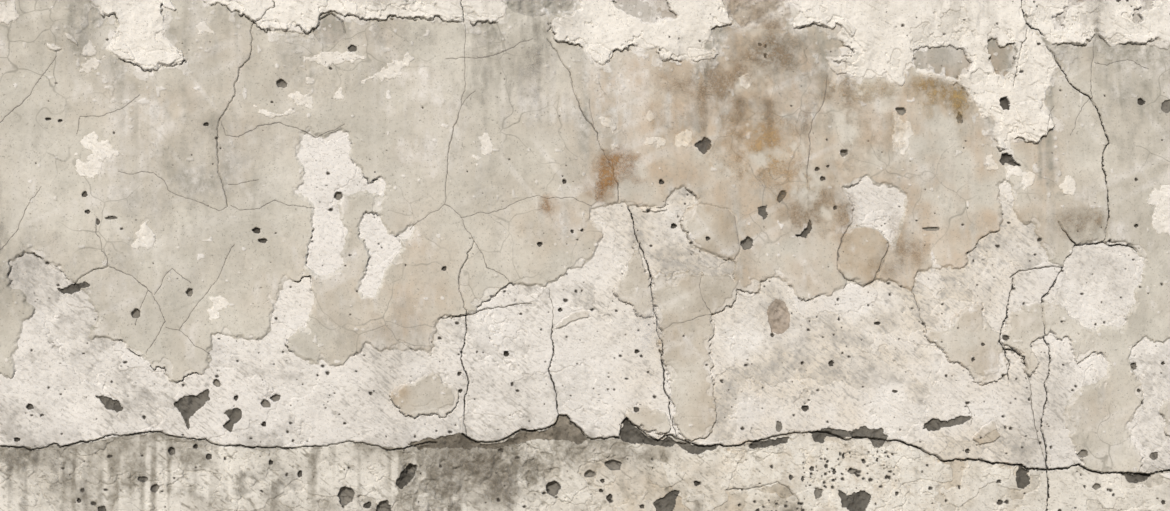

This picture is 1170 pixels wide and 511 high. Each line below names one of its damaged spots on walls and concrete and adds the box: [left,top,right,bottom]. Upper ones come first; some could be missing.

crack [1,56,57,122]
peeling [47,0,184,73]
crack [77,216,234,354]
crack [119,1,344,211]
spalling [295,131,386,275]
spalling [0,153,1144,489]
corrosion [597,155,622,195]
peeling [202,0,1170,156]
crack [410,0,1170,511]
corrosion [918,80,967,108]
crack [0,431,436,451]
spalling [1122,337,1170,483]